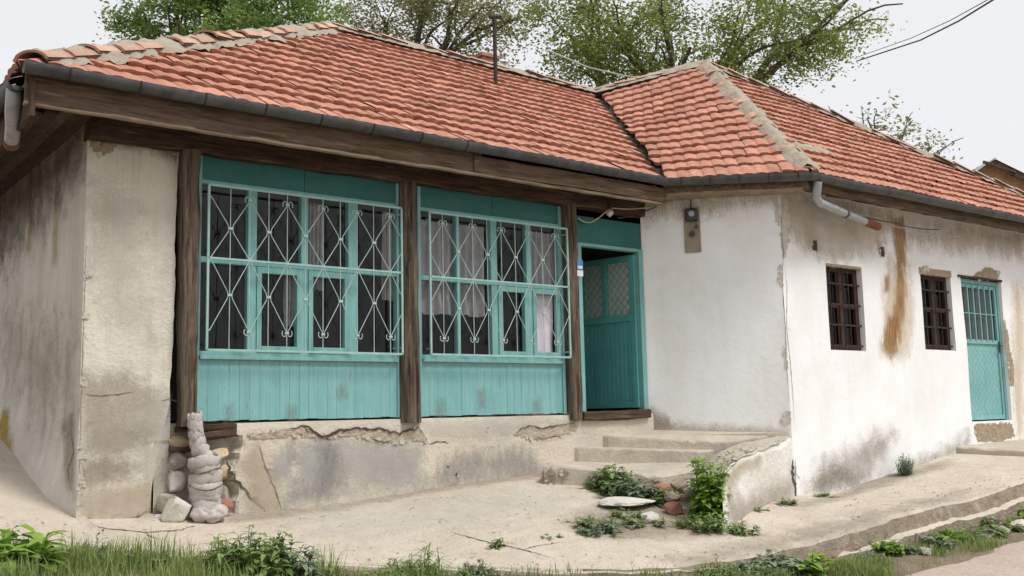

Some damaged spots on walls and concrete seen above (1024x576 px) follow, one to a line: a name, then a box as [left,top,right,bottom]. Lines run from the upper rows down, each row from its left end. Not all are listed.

flaking render [974,267,1001,282]
rust [884,219,913,358]
flaking render [247,425,427,445]
crack [288,425,447,444]
peeling [514,420,578,442]
flaking render [974,421,1015,442]
crack [225,446,281,512]